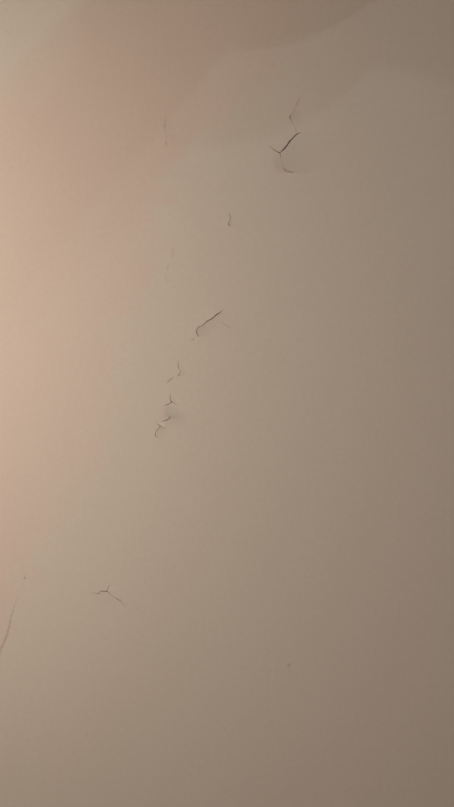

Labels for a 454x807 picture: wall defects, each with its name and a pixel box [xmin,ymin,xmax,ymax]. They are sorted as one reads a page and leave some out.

crack [190,306,232,342]